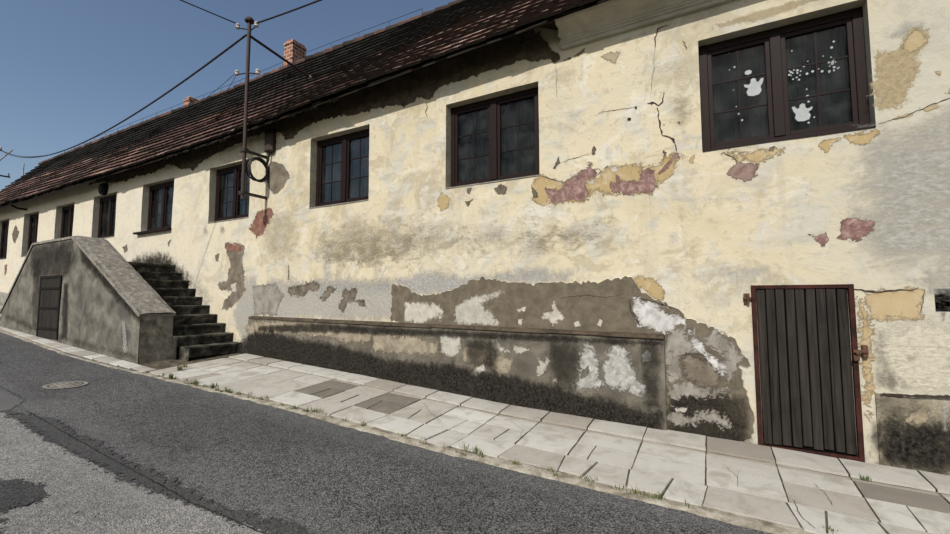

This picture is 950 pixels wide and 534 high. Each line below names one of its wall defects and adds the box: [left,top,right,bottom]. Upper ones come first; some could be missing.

peeling [249,208,274,238]
peeling [265,161,290,194]
spalling [89,29,588,186]
peeling [529,146,695,207]
crack [598,25,687,152]
peeling [721,144,789,182]
peeling [808,217,875,247]
peeling [818,26,950,153]
spalling [215,241,755,442]
damp [235,270,747,443]
peeling [854,283,925,421]
damp [872,415,950,474]